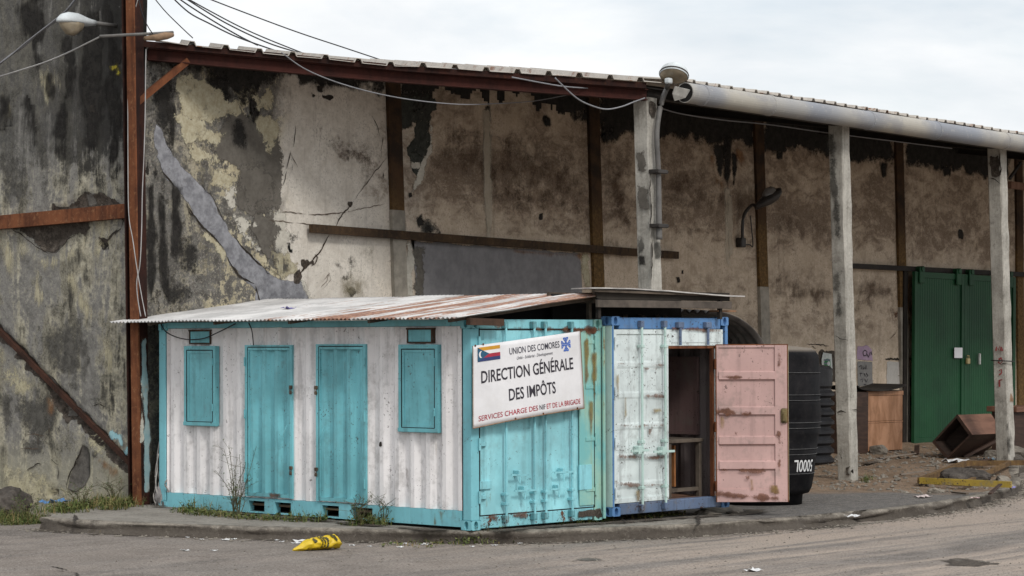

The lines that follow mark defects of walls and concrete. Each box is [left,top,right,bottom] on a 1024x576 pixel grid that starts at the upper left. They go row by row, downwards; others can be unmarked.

spalling [13,222,108,252]
water stain [15,0,122,194]
spalling [52,192,119,210]
flaking render [174,73,312,299]
crack [271,118,385,299]
flaking render [401,93,437,198]
water stain [657,102,840,265]
water stain [849,137,988,180]
water stain [834,272,842,315]
corrosion [536,326,600,429]
corrosion [716,408,751,423]
corrosion [715,469,779,501]